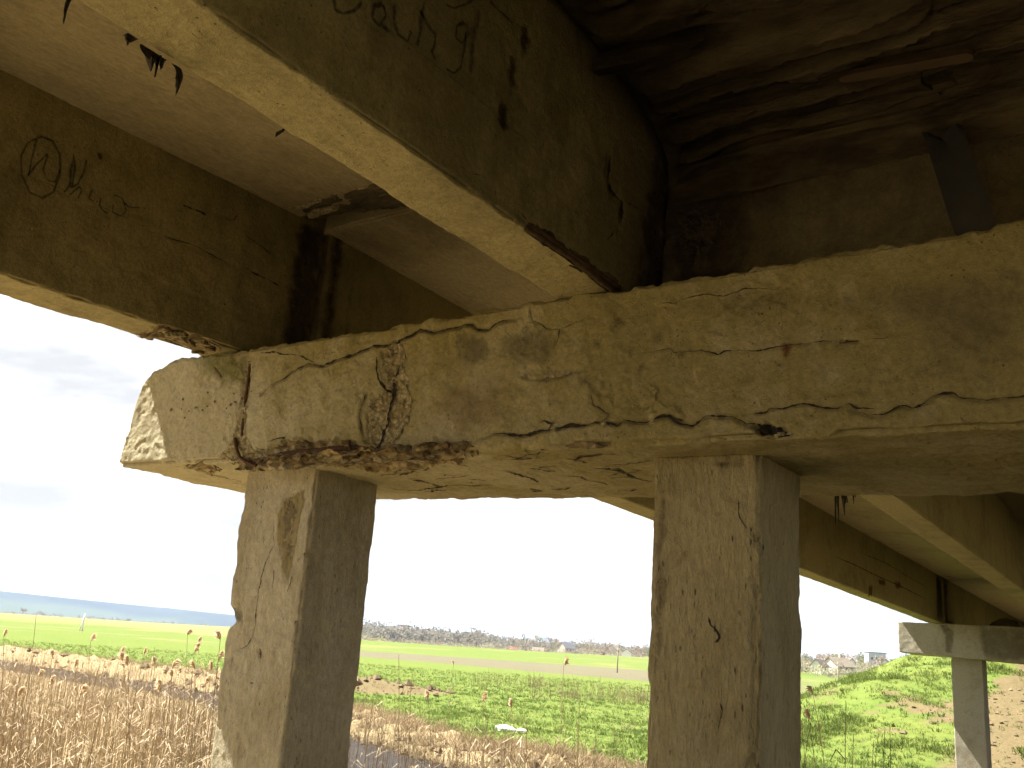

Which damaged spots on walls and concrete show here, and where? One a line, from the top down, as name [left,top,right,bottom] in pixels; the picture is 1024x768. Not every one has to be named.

spalling [137,324,220,355]
water stain [284,226,342,344]
crack [262,312,582,394]
crack [662,287,780,304]
crack [649,314,836,355]
spalling [181,341,480,475]
crack [382,468,483,493]
crack [490,392,1024,492]
spalling [757,424,796,439]
crack [241,528,292,649]